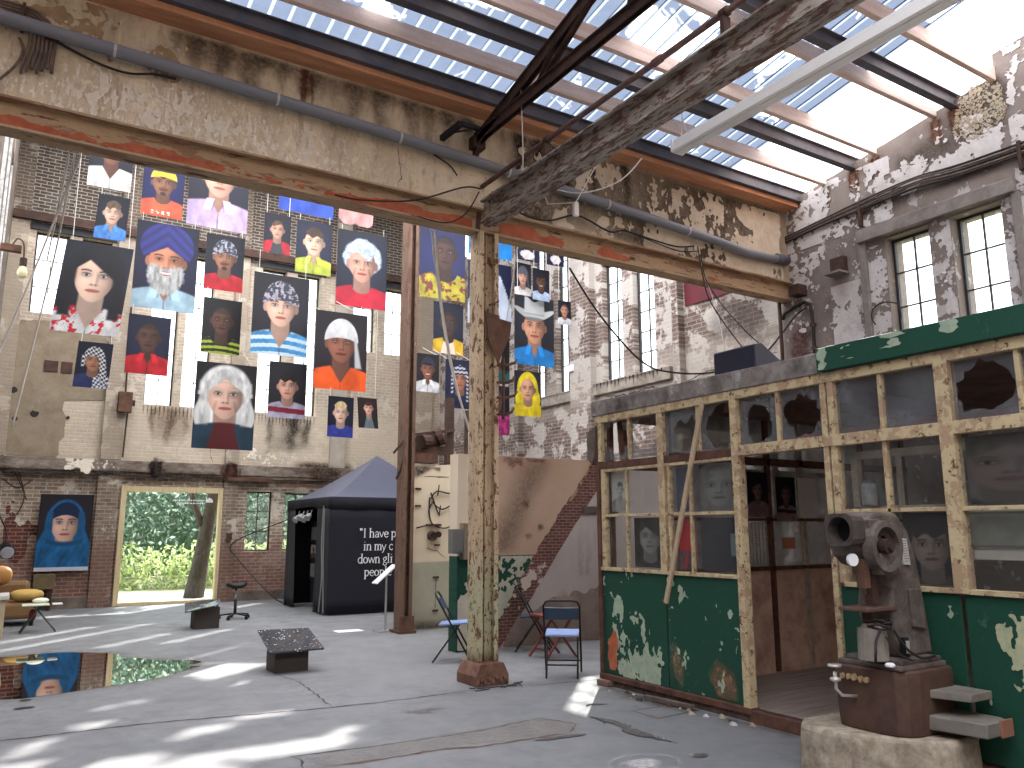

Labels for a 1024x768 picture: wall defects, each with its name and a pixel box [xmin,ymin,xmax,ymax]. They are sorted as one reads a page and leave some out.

peeling [499,38,1024,370]
flaking render [498,461,598,648]
peeling [603,572,664,685]
peeling [995,614,1024,692]